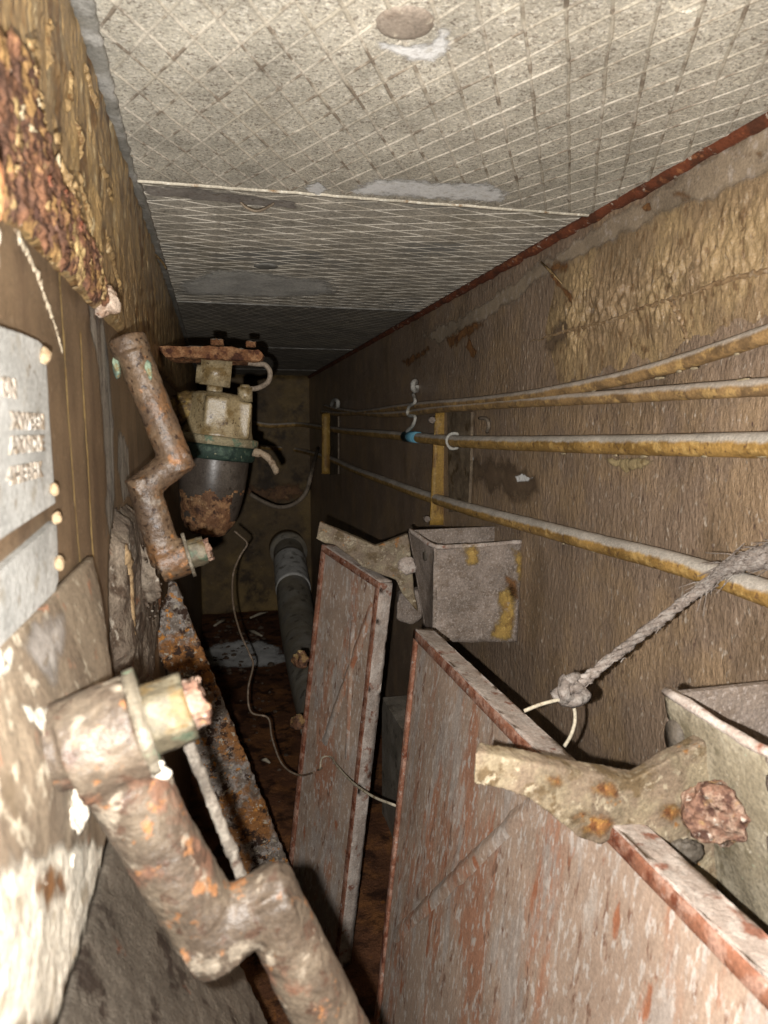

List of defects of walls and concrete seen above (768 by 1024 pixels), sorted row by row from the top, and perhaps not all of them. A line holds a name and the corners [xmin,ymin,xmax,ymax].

leakage [380,29,449,62]
leakage [352,179,504,202]
leakage [473,457,536,501]